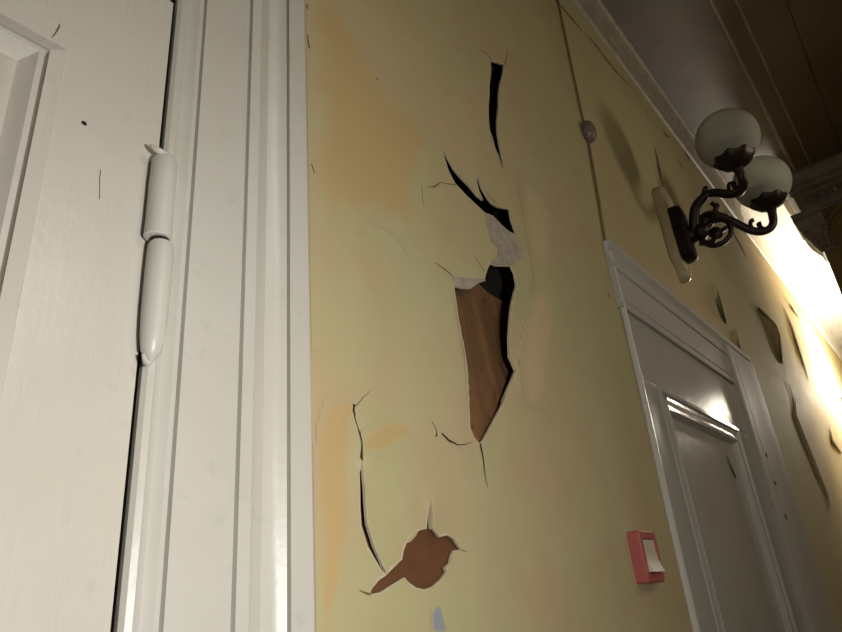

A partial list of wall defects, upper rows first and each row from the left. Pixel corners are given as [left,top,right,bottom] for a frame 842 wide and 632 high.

flaking render [428,146,522,486]
crack [353,394,387,575]
spalling [360,499,465,596]